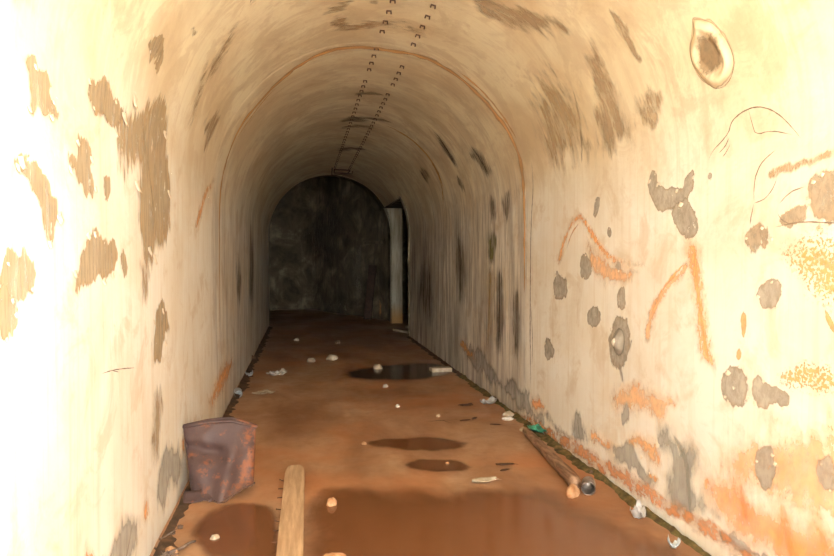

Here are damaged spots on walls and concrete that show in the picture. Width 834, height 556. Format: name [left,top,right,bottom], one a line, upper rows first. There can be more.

peeling [68,133,111,201]
peeling [88,75,171,267]
crack [710,106,800,156]
peeling [745,171,834,252]
crack [750,152,834,227]
peeling [0,247,36,343]
peeling [73,227,128,294]
rust [646,246,713,363]
rust [785,232,834,300]
rust [781,362,834,393]
rust [524,416,751,556]
rust [706,480,834,556]